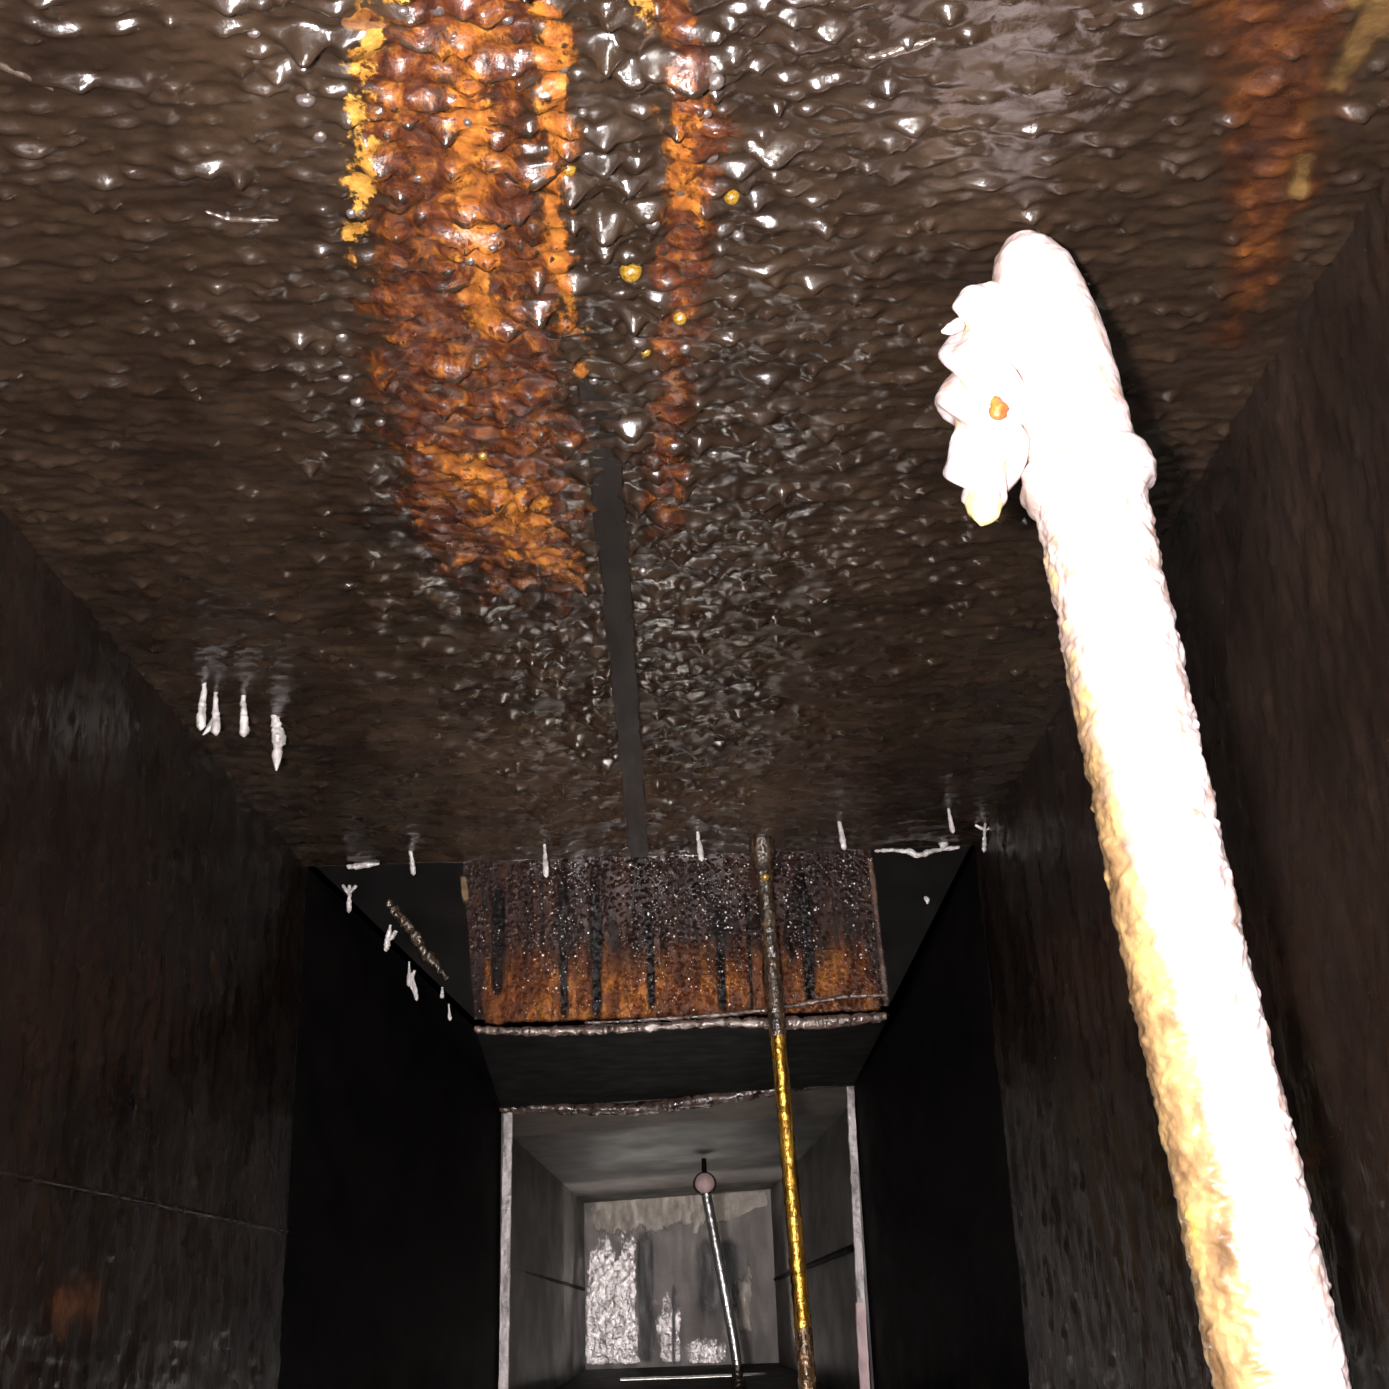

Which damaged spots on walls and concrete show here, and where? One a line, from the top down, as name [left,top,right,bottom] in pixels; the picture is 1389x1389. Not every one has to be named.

corrosion [340,0,589,615]
corrosion [628,0,731,544]
corrosion [461,876,469,902]
corrosion [479,853,888,1024]